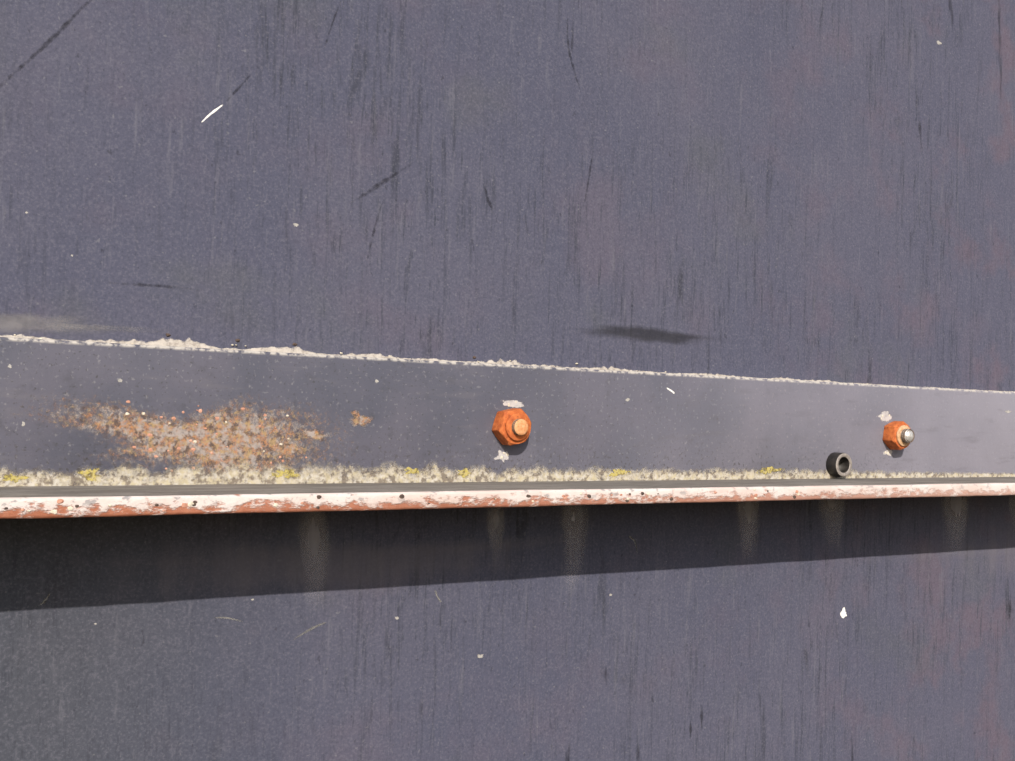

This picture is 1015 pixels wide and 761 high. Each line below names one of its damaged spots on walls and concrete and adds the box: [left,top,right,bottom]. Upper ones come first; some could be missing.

rust [74,400,327,473]
rust [351,411,370,426]